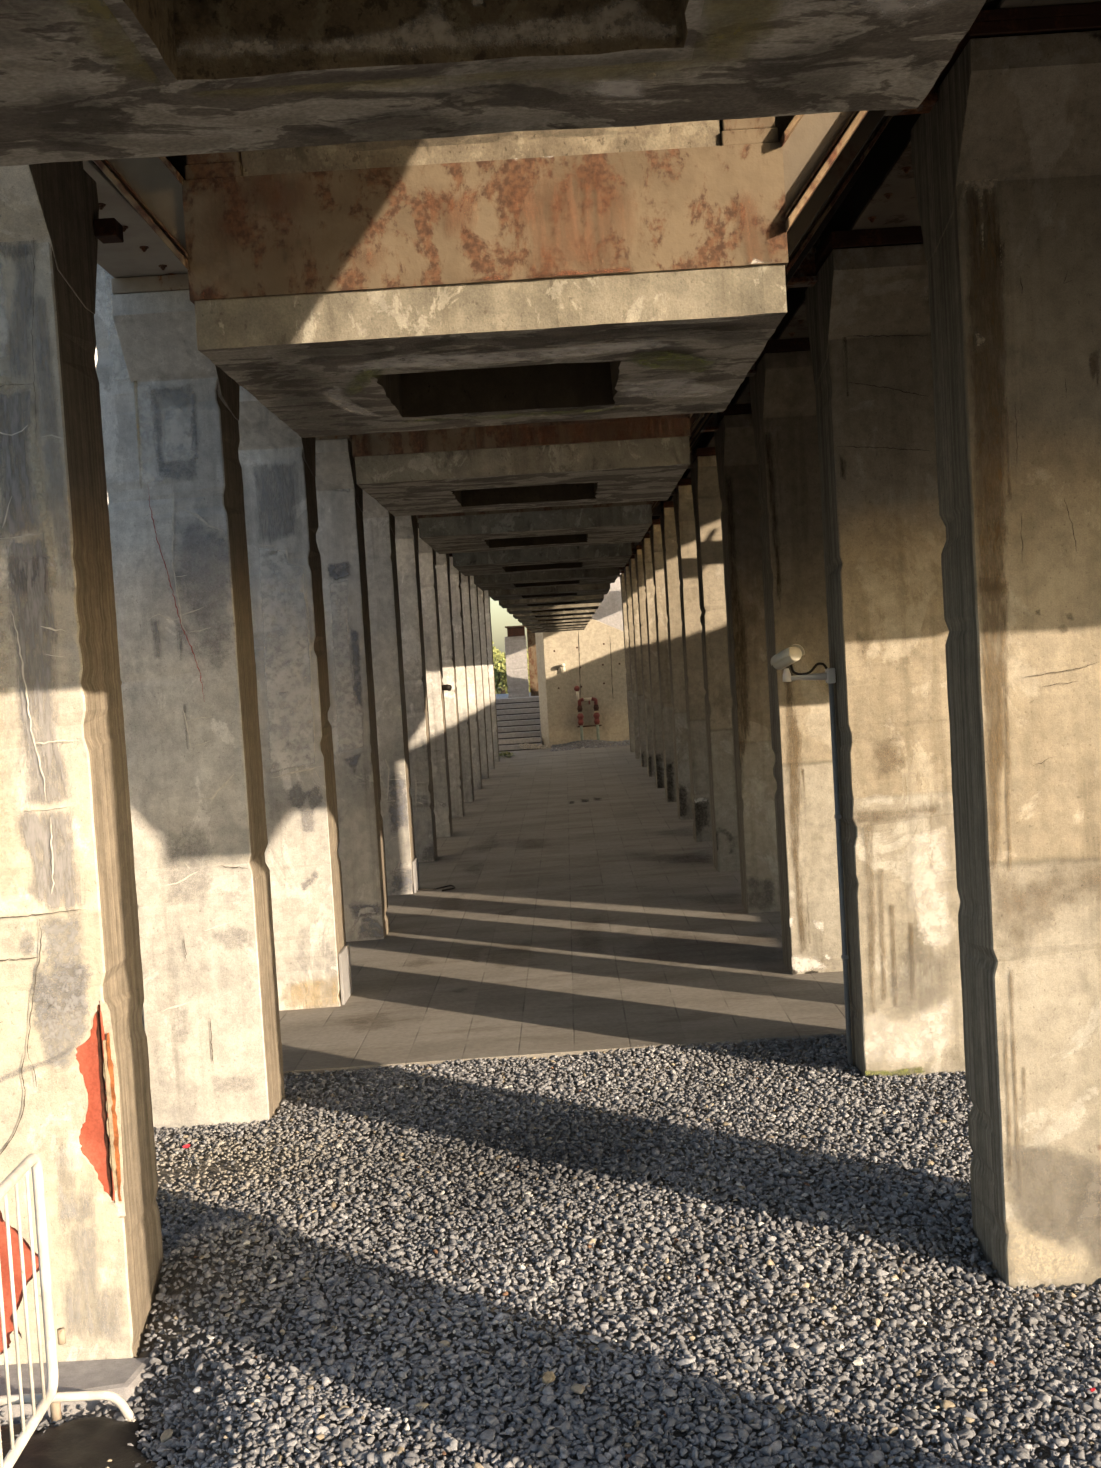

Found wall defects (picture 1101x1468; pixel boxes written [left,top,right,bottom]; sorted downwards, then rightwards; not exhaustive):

corrosion [510,414,691,446]
damp [963,179,1011,866]
crack [0,909,86,1154]
spalling [76,1001,122,1203]
damp [1005,1041,1101,1275]